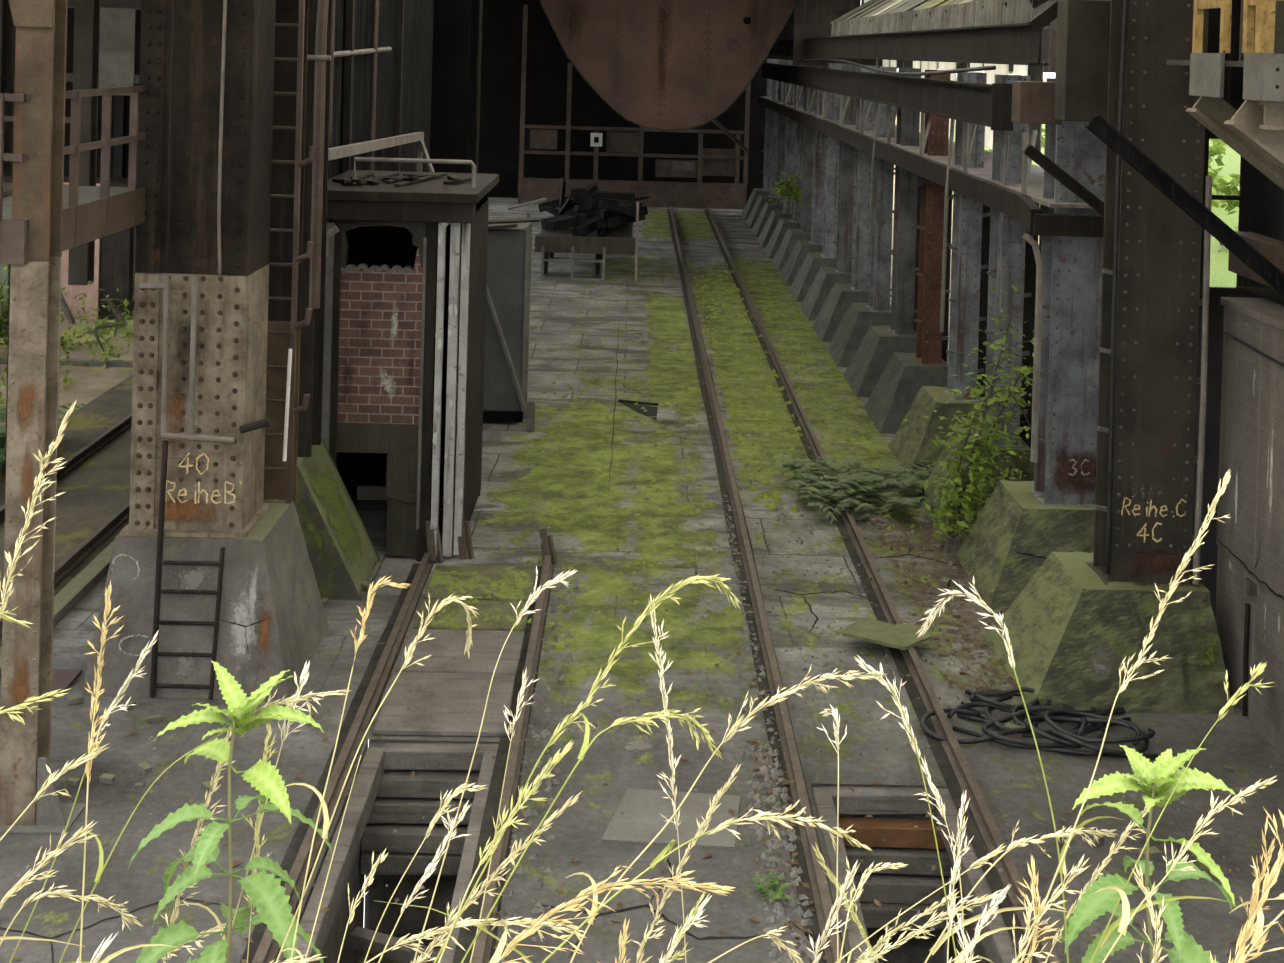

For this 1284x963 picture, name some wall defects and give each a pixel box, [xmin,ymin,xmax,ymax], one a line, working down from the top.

corrosion [17,386,35,426]
corrosion [21,454,34,503]
corrosion [1054,450,1096,493]
crack [1218,540,1284,600]
corrosion [9,664,28,705]